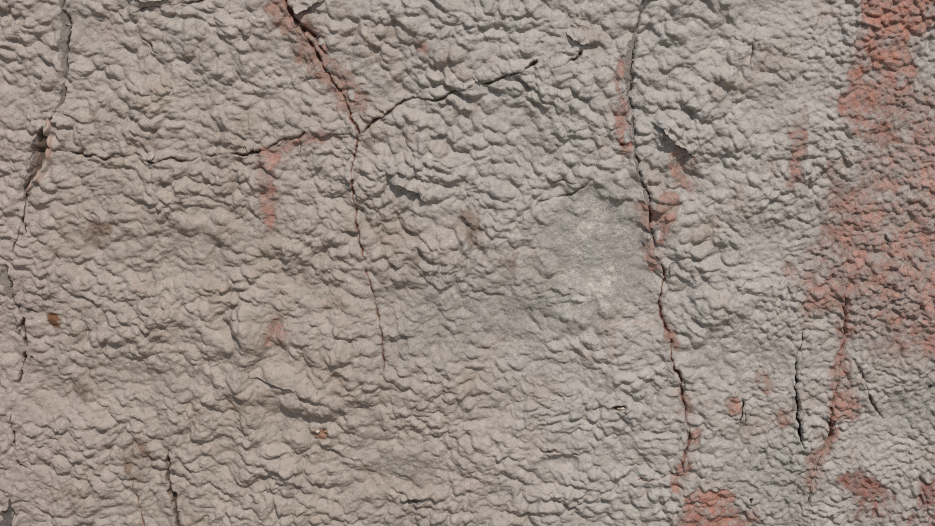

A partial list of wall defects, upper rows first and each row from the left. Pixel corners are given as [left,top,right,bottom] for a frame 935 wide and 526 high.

crack [45,0,80,126]
crack [0,188,37,382]
crack [58,0,581,371]
crack [536,179,592,205]
crack [619,0,694,482]
peeling [782,0,935,489]
crack [740,402,750,424]
crack [788,296,883,507]
peeling [837,469,896,523]
peeling [906,480,935,526]